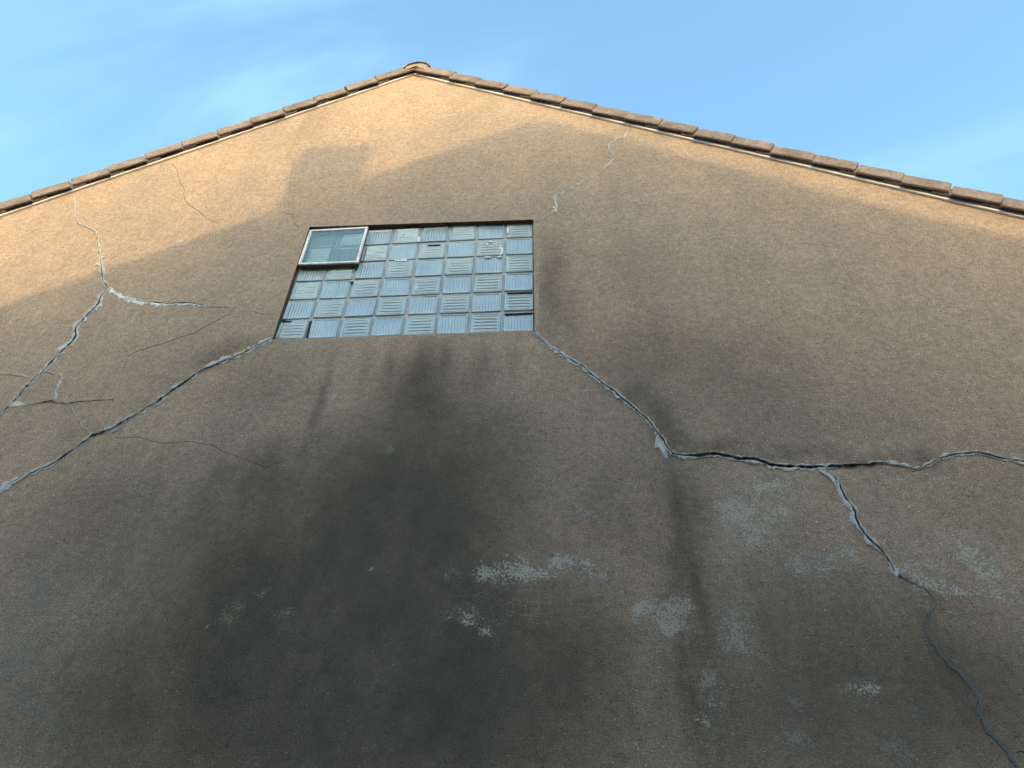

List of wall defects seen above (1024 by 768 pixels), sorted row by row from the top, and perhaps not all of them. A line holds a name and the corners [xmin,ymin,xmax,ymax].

crack [536,130,629,221]
crack [0,194,285,494]
water stain [218,436,525,768]
crack [535,332,1024,768]